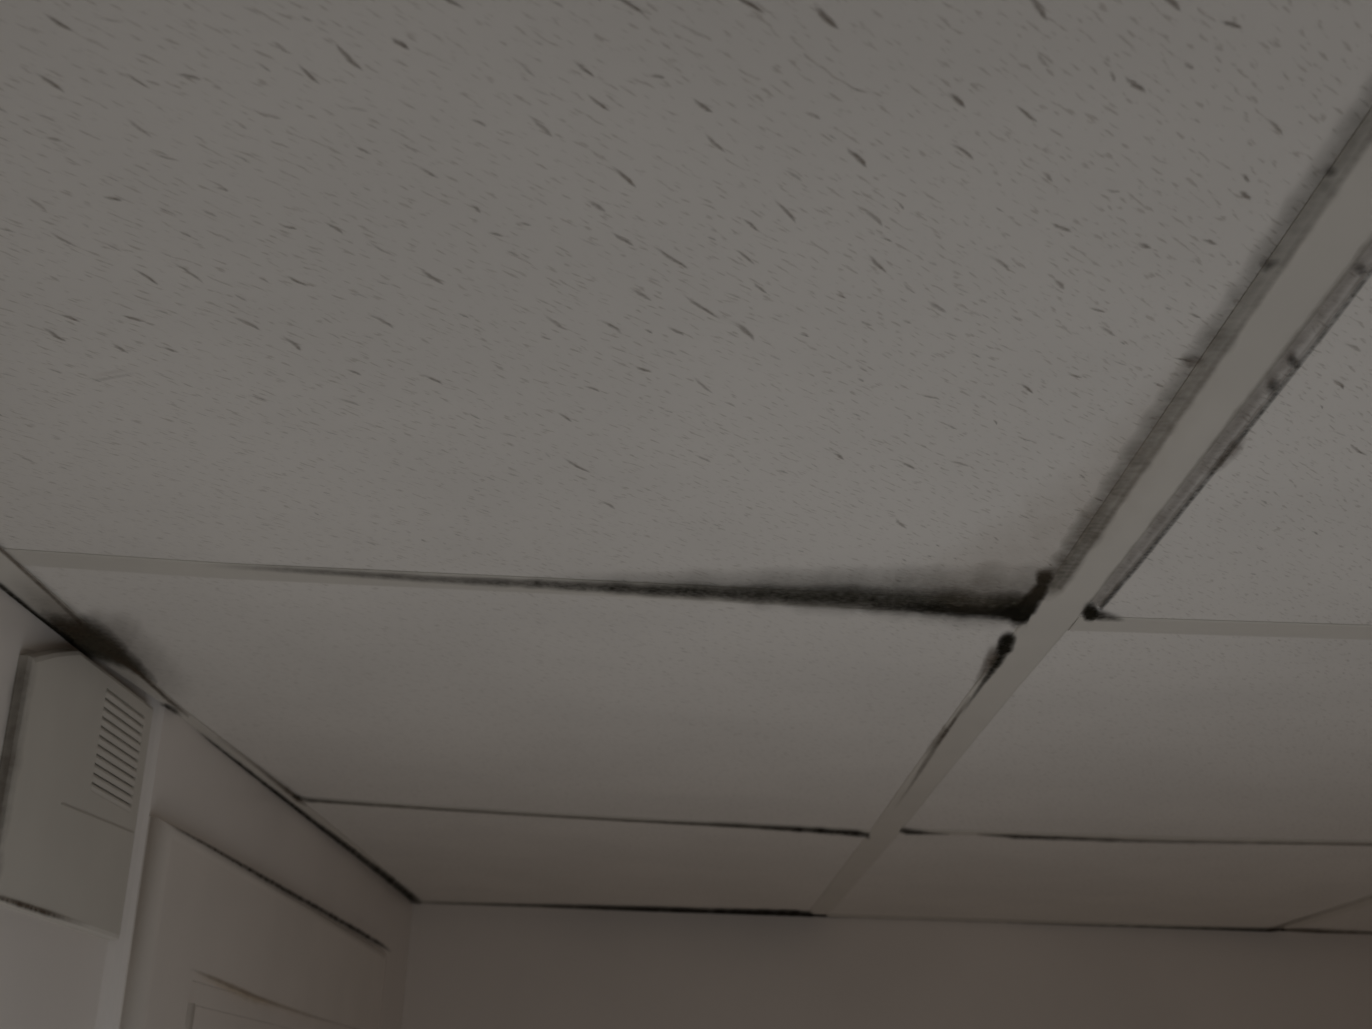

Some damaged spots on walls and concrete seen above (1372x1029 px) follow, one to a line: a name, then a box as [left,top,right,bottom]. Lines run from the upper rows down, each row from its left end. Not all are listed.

leakage [467,527,1092,691]
leakage [1082,605,1116,621]
leakage [52,621,146,675]